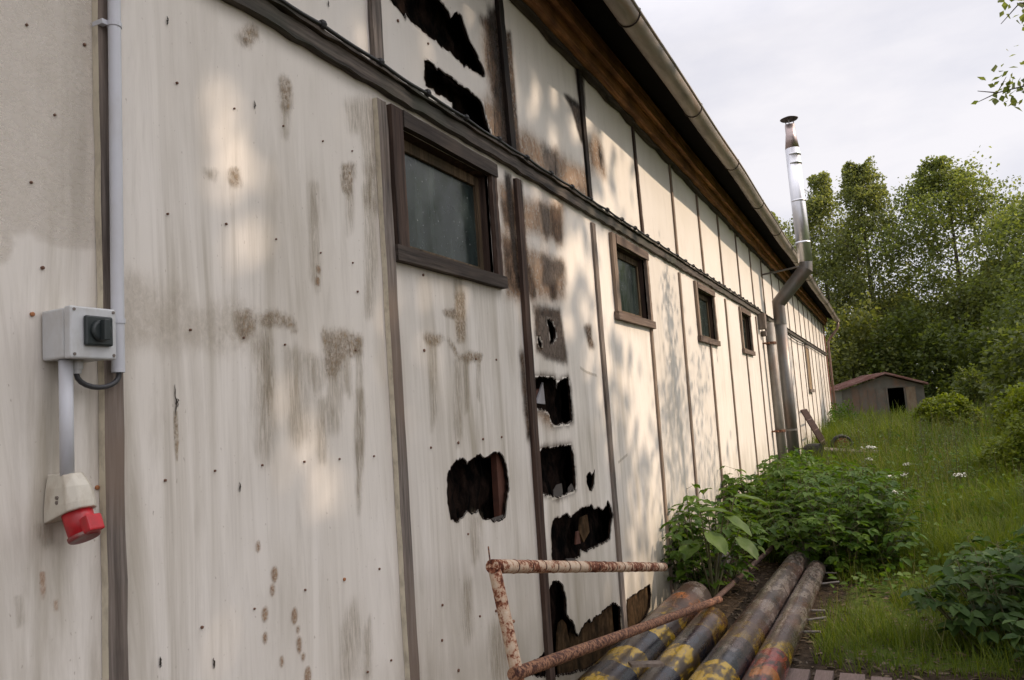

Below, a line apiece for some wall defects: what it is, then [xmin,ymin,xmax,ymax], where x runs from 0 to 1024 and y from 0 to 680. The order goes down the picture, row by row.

damp [323,332,361,371]